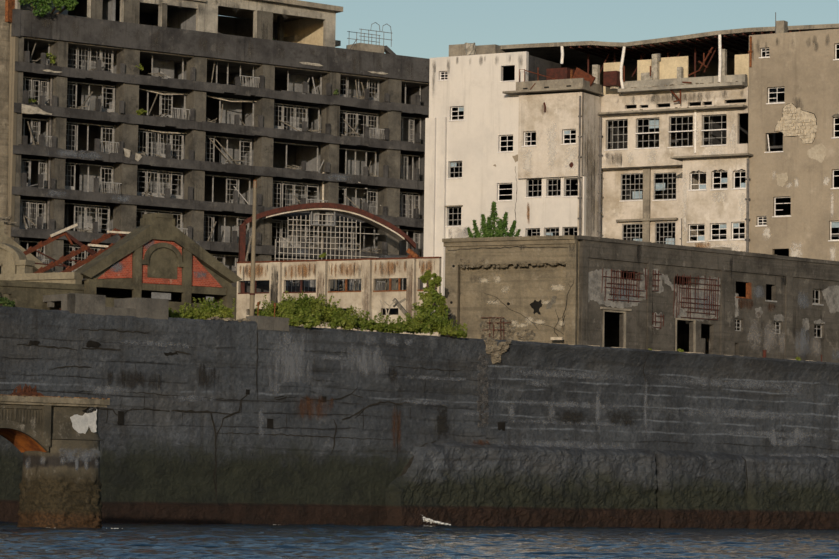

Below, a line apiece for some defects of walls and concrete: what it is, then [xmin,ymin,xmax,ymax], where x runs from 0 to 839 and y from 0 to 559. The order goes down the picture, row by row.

spalling [774,103,826,163]
spalling [588,268,721,330]
spalling [822,285,839,313]
crack [17,329,149,369]
spalling [476,284,564,427]
rust [0,428,46,452]
peeling [70,407,97,434]
crack [79,326,476,502]